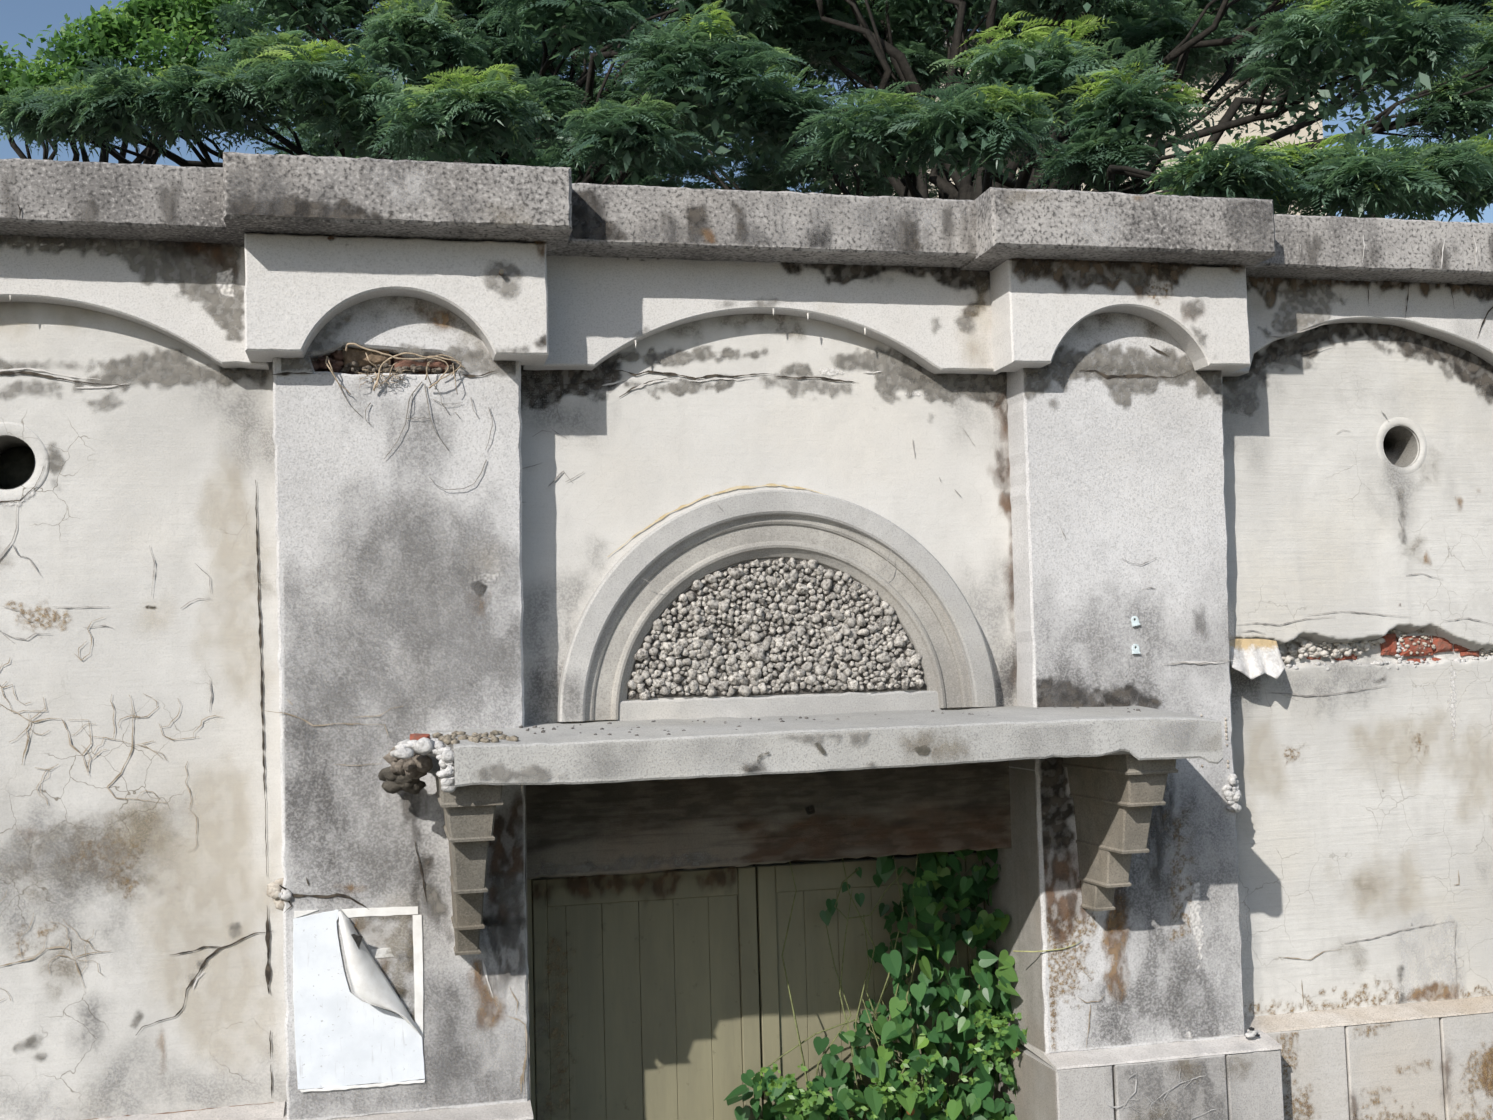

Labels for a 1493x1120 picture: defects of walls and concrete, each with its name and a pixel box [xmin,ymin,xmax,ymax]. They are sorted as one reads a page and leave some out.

peeling [521,346,766,409]
peeling [763,343,1222,407]
crack [0,508,220,852]
spalling [1229,629,1493,679]
crack [133,480,402,1035]
water stain [790,733,869,754]
water stain [402,792,446,920]
rust [1040,757,1128,1048]
water stain [1102,785,1217,1038]
rust [1249,983,1493,1015]
crack [267,1031,275,1096]
rust [1280,1032,1313,1120]